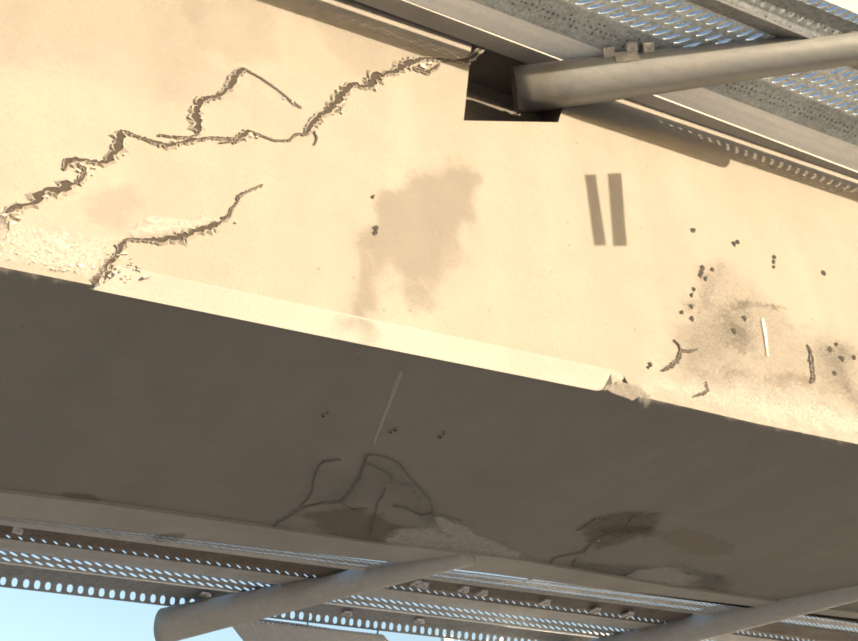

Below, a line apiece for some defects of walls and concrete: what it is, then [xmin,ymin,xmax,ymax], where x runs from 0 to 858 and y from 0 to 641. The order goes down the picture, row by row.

crack [0,47,488,252]
crack [89,184,263,287]
water stain [643,374,858,432]
crack [273,453,462,534]